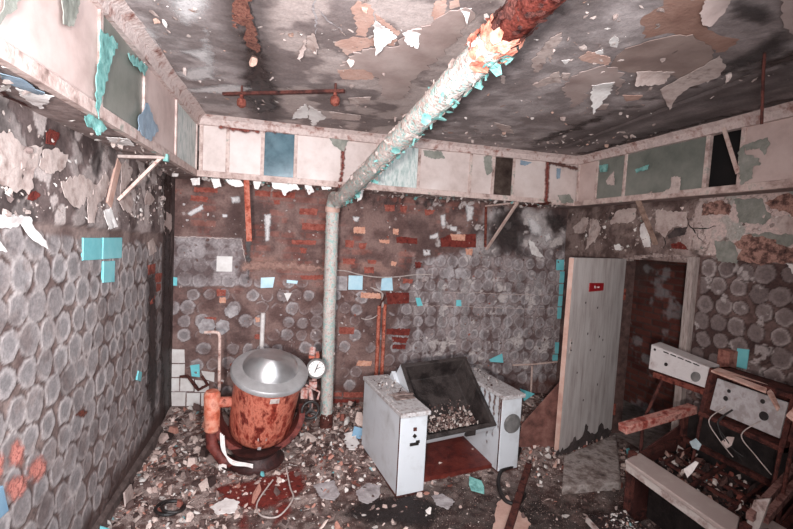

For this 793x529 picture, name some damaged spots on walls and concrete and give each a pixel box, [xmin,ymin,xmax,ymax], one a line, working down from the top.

peeling [335,0,475,100]
peeling [531,0,739,114]
peeling [0,73,55,109]
peeling [84,28,135,146]
peeling [292,103,361,126]
peeling [0,129,133,230]
peeling [190,178,332,205]
peeling [0,214,48,249]
flaking render [440,234,476,256]
peeling [528,240,543,257]
peeling [573,208,688,250]
peeling [702,193,793,274]